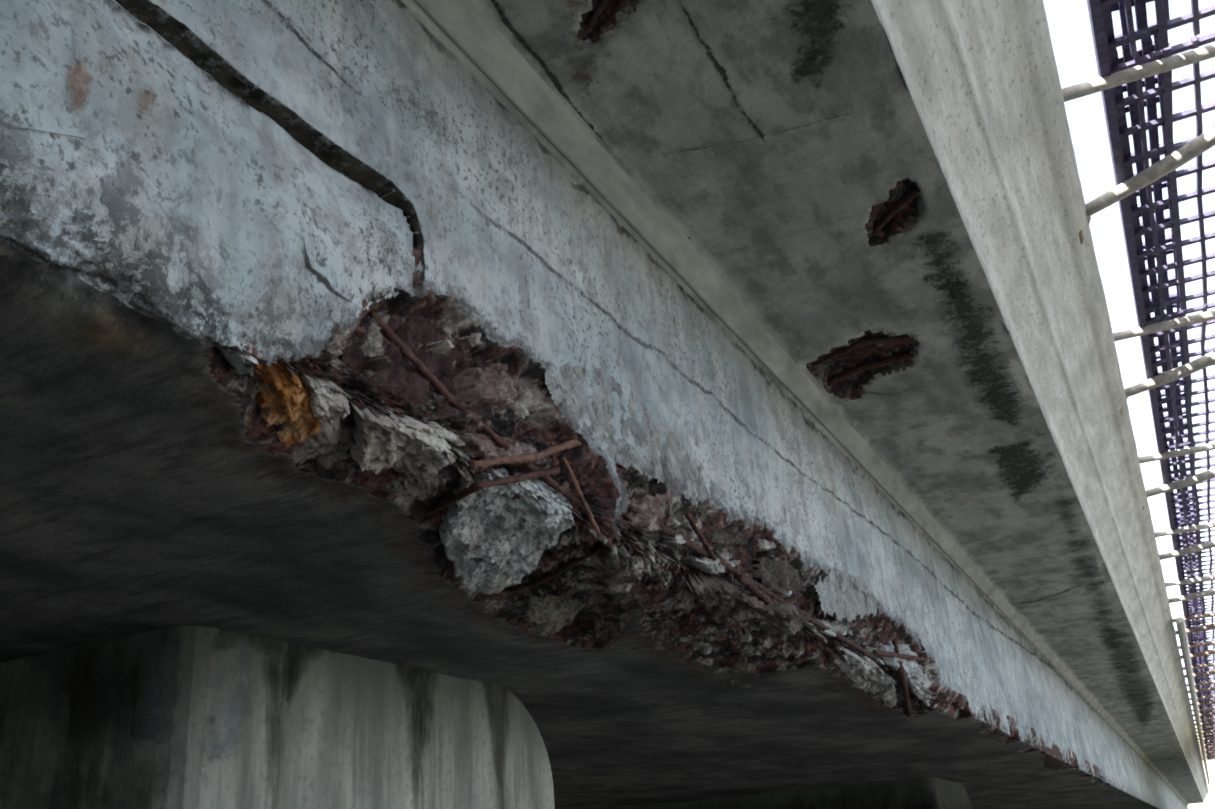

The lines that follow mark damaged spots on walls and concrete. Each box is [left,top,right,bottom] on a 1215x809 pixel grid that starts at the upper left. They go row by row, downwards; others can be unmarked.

spalling [577,0,645,44]
leakage [786,0,851,88]
crack [0,120,86,140]
crack [107,0,425,290]
crack [303,237,352,302]
leakage [912,232,1024,426]
spalling [0,162,1099,781]
leakage [986,440,1052,501]
leakage [206,628,322,761]
leakage [396,664,436,788]
leakage [485,683,523,809]